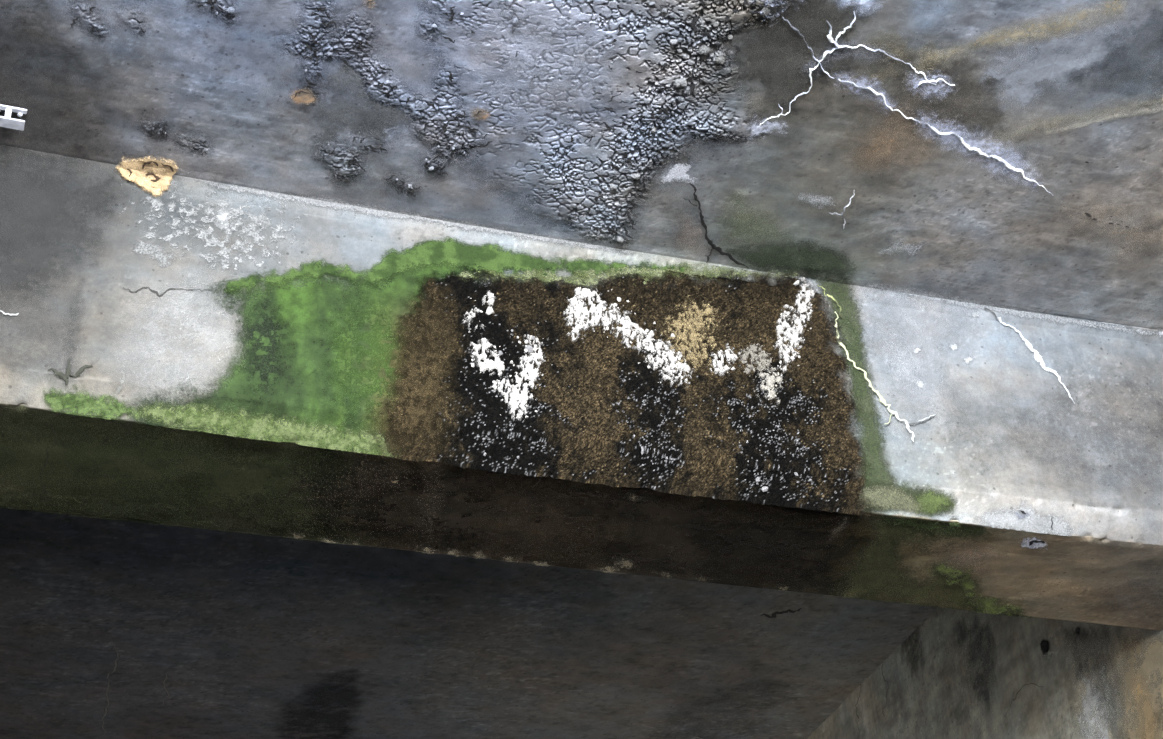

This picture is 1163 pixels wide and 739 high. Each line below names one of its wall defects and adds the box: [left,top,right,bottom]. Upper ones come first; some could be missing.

corrosion [291,89,315,104]
spalling [276,0,785,246]
crack [753,11,1053,196]
corrosion [116,157,178,195]
crack [684,183,748,268]
crack [829,190,855,229]
leakage [48,352,93,385]
crack [817,285,936,442]
crack [984,306,1075,404]
leakage [285,269,884,597]